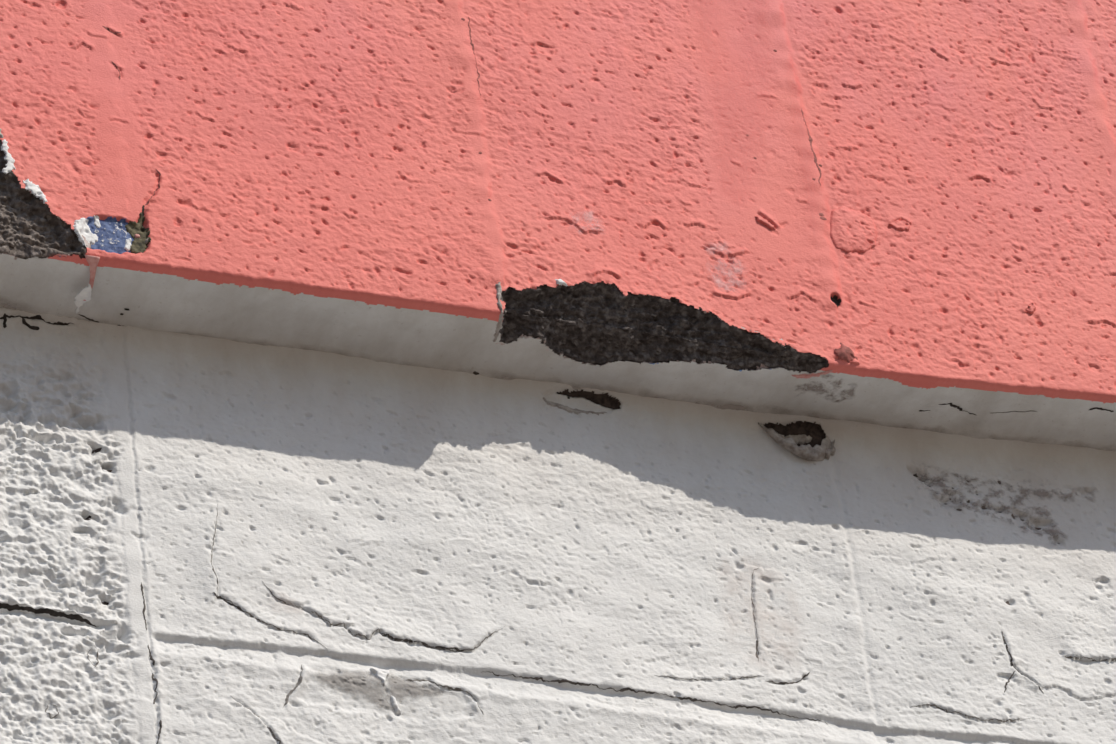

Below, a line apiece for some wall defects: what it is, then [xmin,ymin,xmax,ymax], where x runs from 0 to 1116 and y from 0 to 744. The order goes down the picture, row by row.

spalling [0,129,151,314]
crack [0,308,129,330]
spalling [493,279,833,379]
peeling [758,421,836,461]
crack [919,403,1037,415]
crack [0,603,99,667]
crack [141,582,162,744]
crack [211,506,827,724]
crack [1065,654,1116,662]
crack [231,696,281,744]